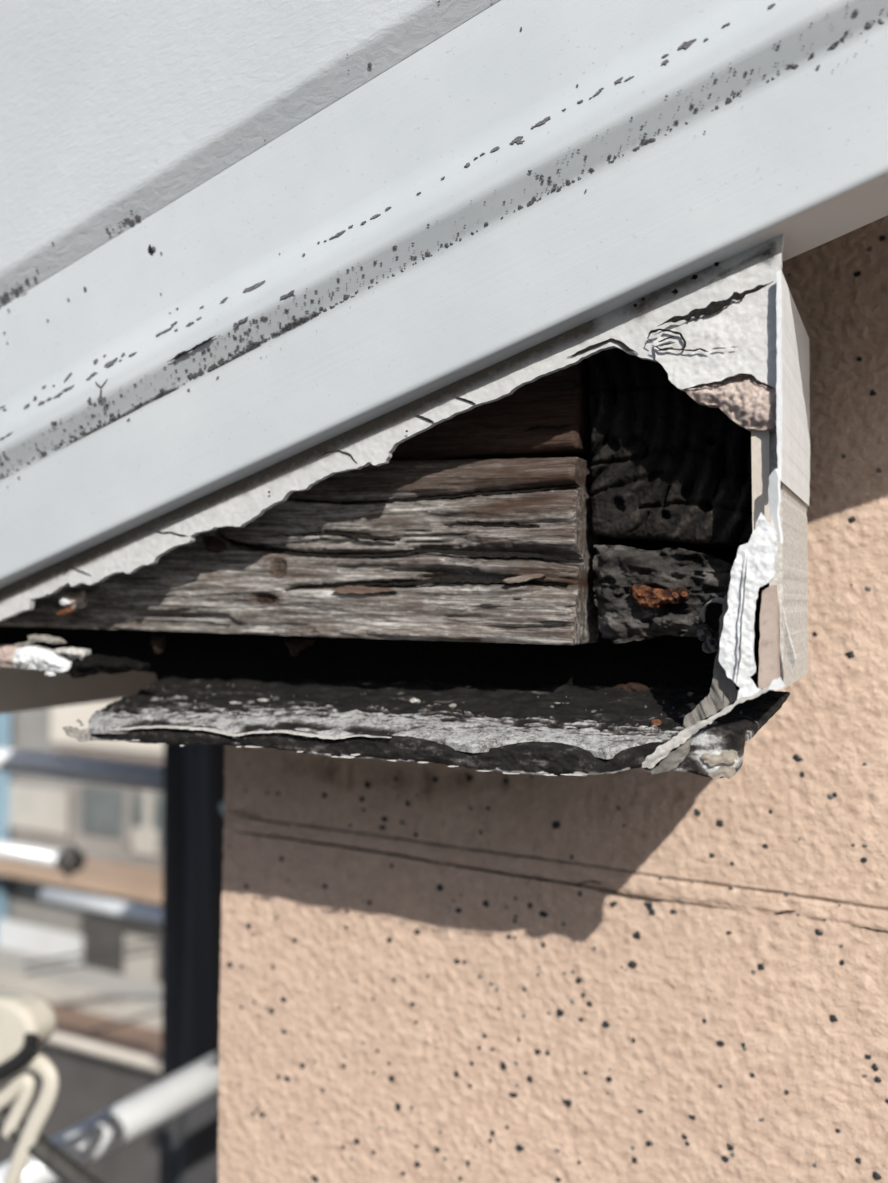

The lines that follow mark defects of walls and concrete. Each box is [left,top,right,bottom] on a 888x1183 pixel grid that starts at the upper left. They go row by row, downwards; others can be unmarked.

damp [827,2,888,50]
damp [602,35,857,163]
damp [495,148,594,219]
peeling [317,207,391,244]
peeling [23,352,137,409]
peeling [156,306,204,337]
damp [0,220,488,487]
spalling [684,377,777,432]
damp [0,320,595,599]
rust [629,584,689,607]
peeling [642,469,785,769]
crack [235,818,888,932]